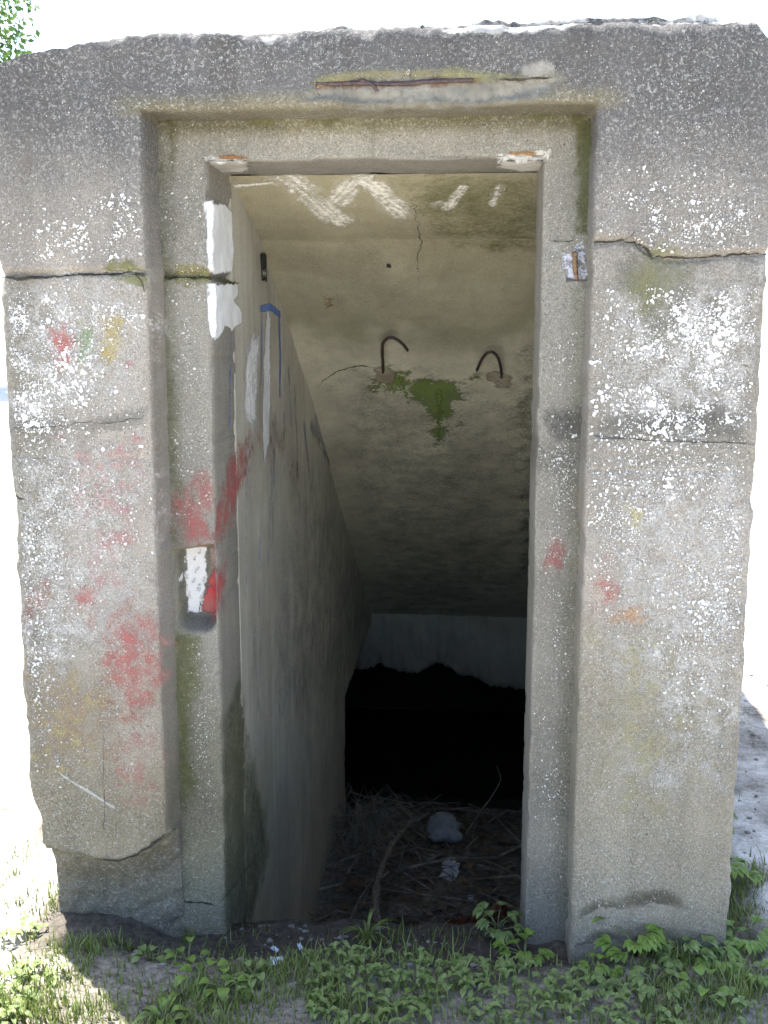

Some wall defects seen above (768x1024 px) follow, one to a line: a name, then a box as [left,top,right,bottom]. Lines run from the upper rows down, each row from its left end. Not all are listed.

crack [554,232,766,259]
crack [1,271,238,292]